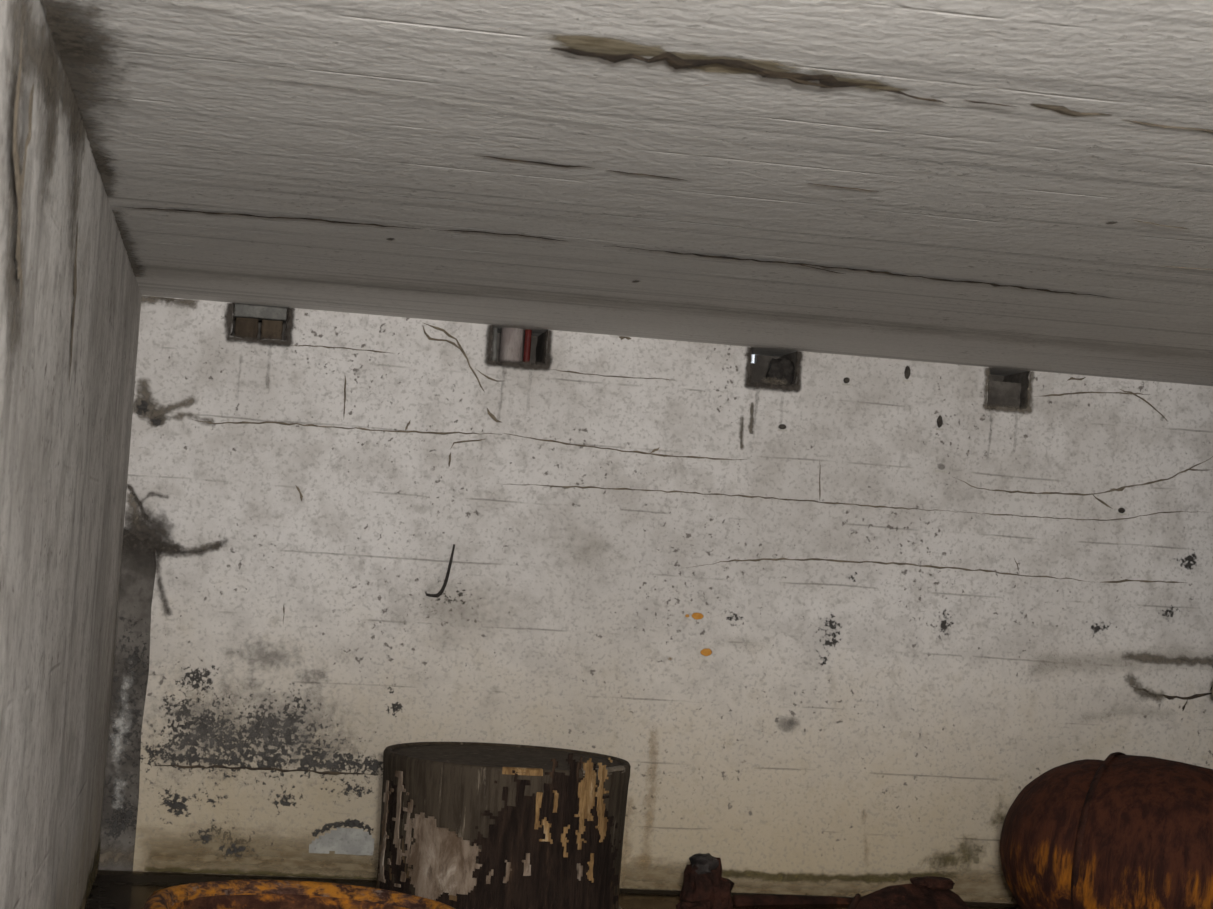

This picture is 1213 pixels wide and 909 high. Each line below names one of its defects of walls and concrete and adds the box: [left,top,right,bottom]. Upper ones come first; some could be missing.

crack [551,35,1213,133]
leakage [4,0,144,352]
leakage [141,296,197,307]
crack [191,322,747,466]
crack [1033,377,1168,422]
crack [497,456,1213,521]
crack [686,558,1185,583]
leakage [1128,675,1164,701]
leakage [1125,653,1213,666]
leakage [81,617,383,909]
leakage [619,865,684,890]
leakage [722,843,1014,903]